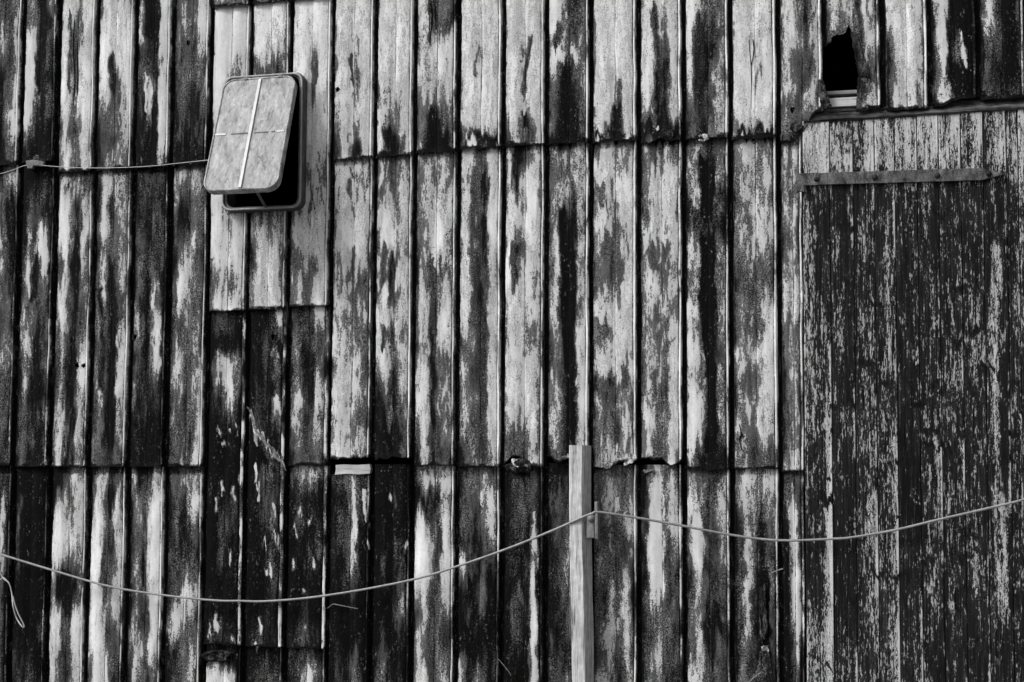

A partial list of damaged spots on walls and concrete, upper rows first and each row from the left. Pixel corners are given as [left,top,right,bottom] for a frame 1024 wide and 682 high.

peeling [812,0,968,105]
peeling [792,109,1024,257]
leakage [0,0,209,682]
leakage [169,0,821,682]
peeling [958,239,1023,454]
peeling [824,433,834,682]
peeling [867,496,879,632]
peeling [892,437,901,682]
peeling [936,448,944,562]
peeling [993,462,1024,619]